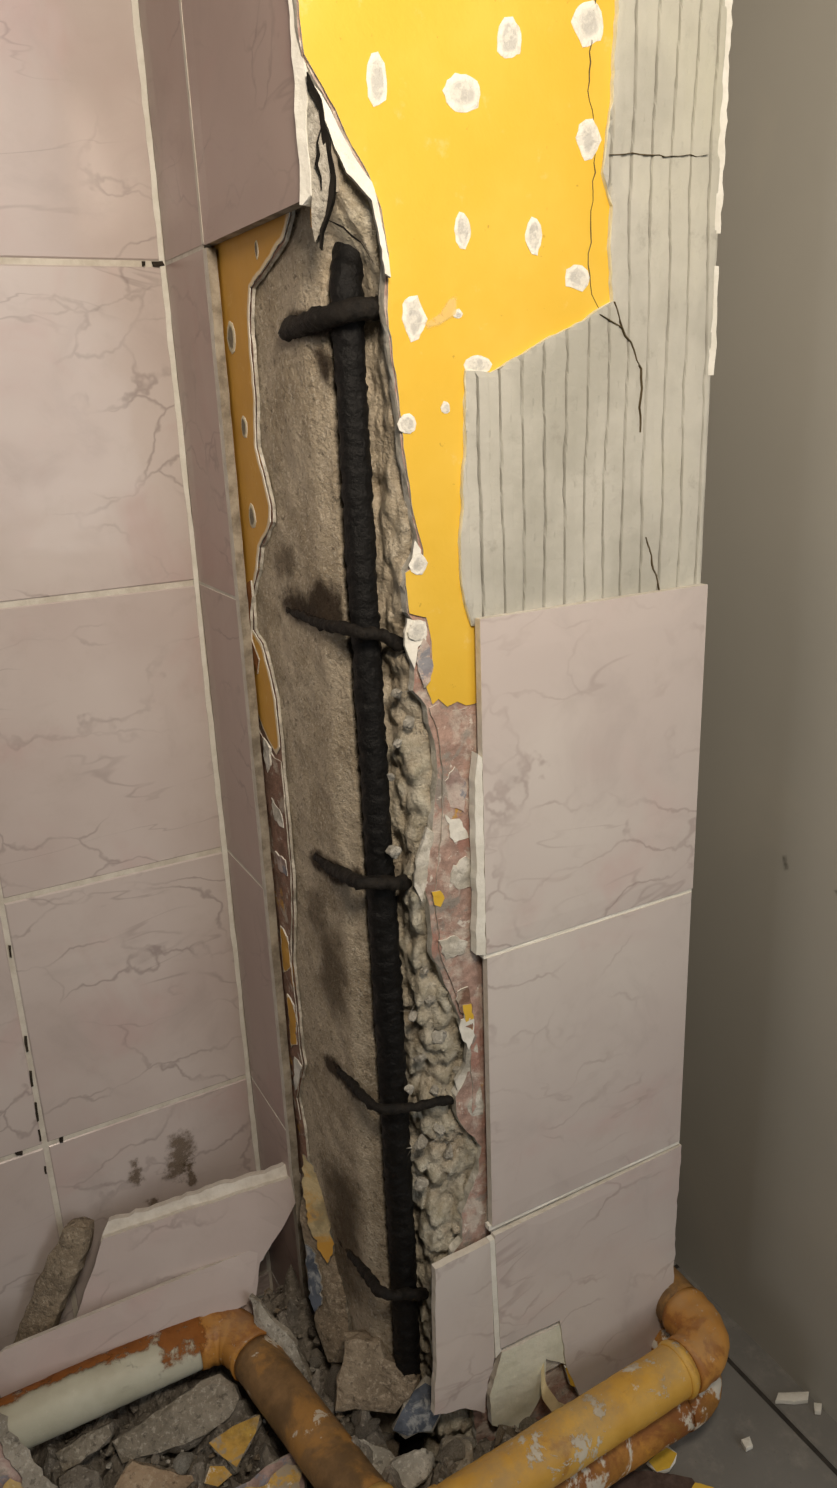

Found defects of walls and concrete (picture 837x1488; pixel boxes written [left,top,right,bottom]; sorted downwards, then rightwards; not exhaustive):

peeling [497,17,522,58]
peeling [571,0,604,47]
peeling [366,52,387,107]
peeling [442,73,480,113]
peeling [576,119,602,161]
peeling [525,217,542,256]
crack [587,0,708,432]
peeling [565,265,590,292]
peeling [464,355,492,372]
spalling [0,85,484,1398]